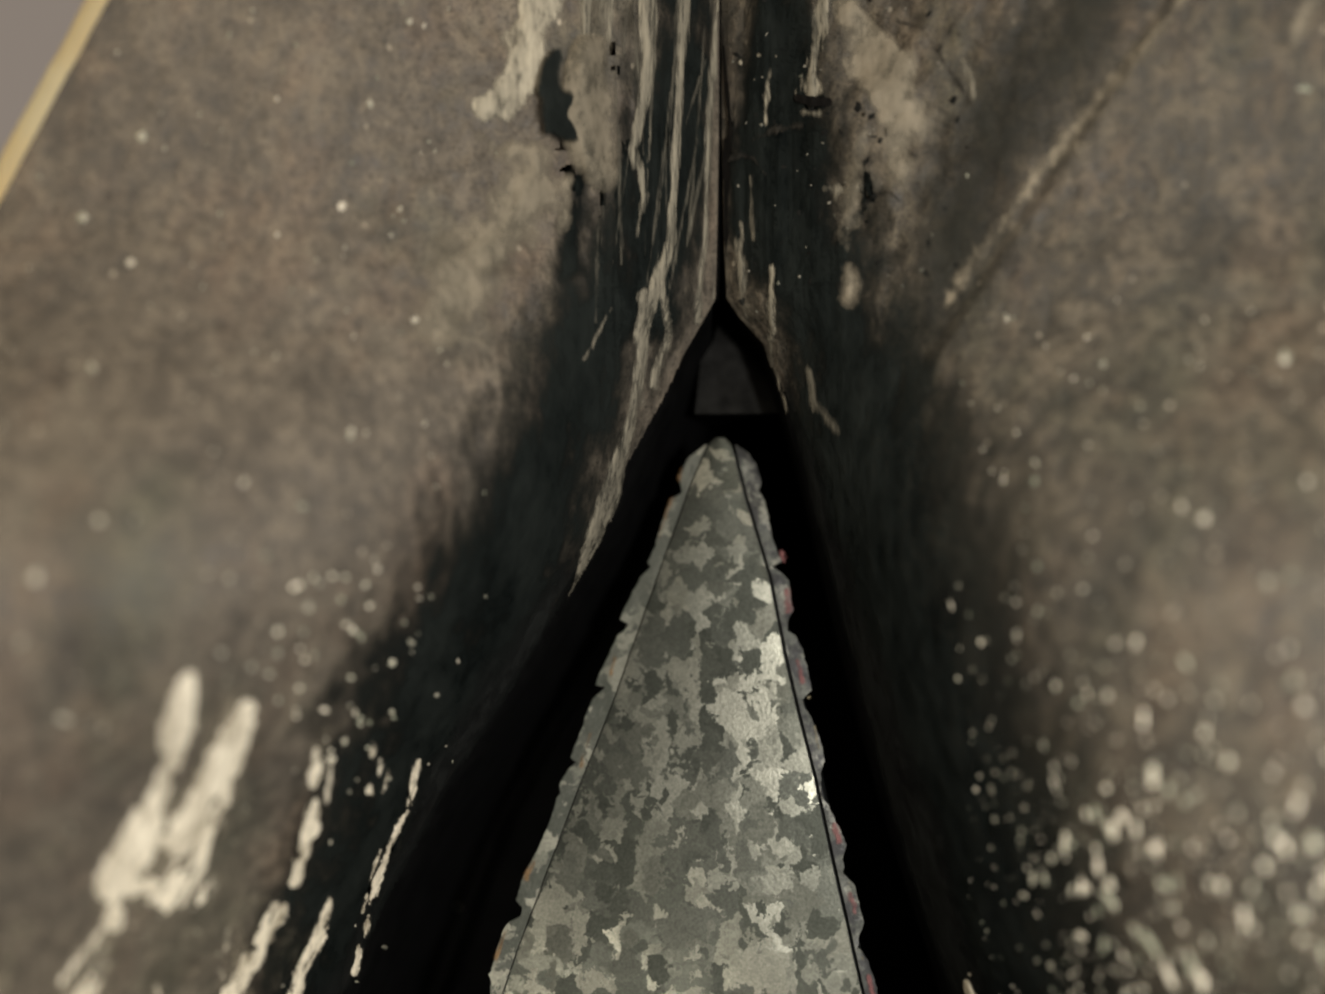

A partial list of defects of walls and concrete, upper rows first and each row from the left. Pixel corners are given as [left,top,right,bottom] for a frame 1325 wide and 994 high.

water stain [248,0,719,994]
water stain [729,0,1114,994]